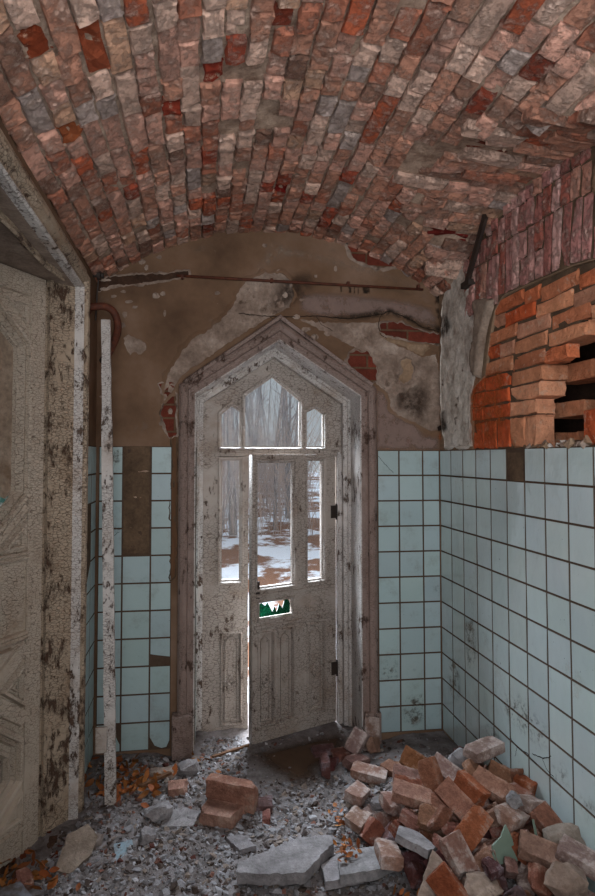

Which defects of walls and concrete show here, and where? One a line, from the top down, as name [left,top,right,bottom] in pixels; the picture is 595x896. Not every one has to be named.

flaking render [157,146,595,581]
water stain [377,390,446,449]
peeling [123,446,150,554]